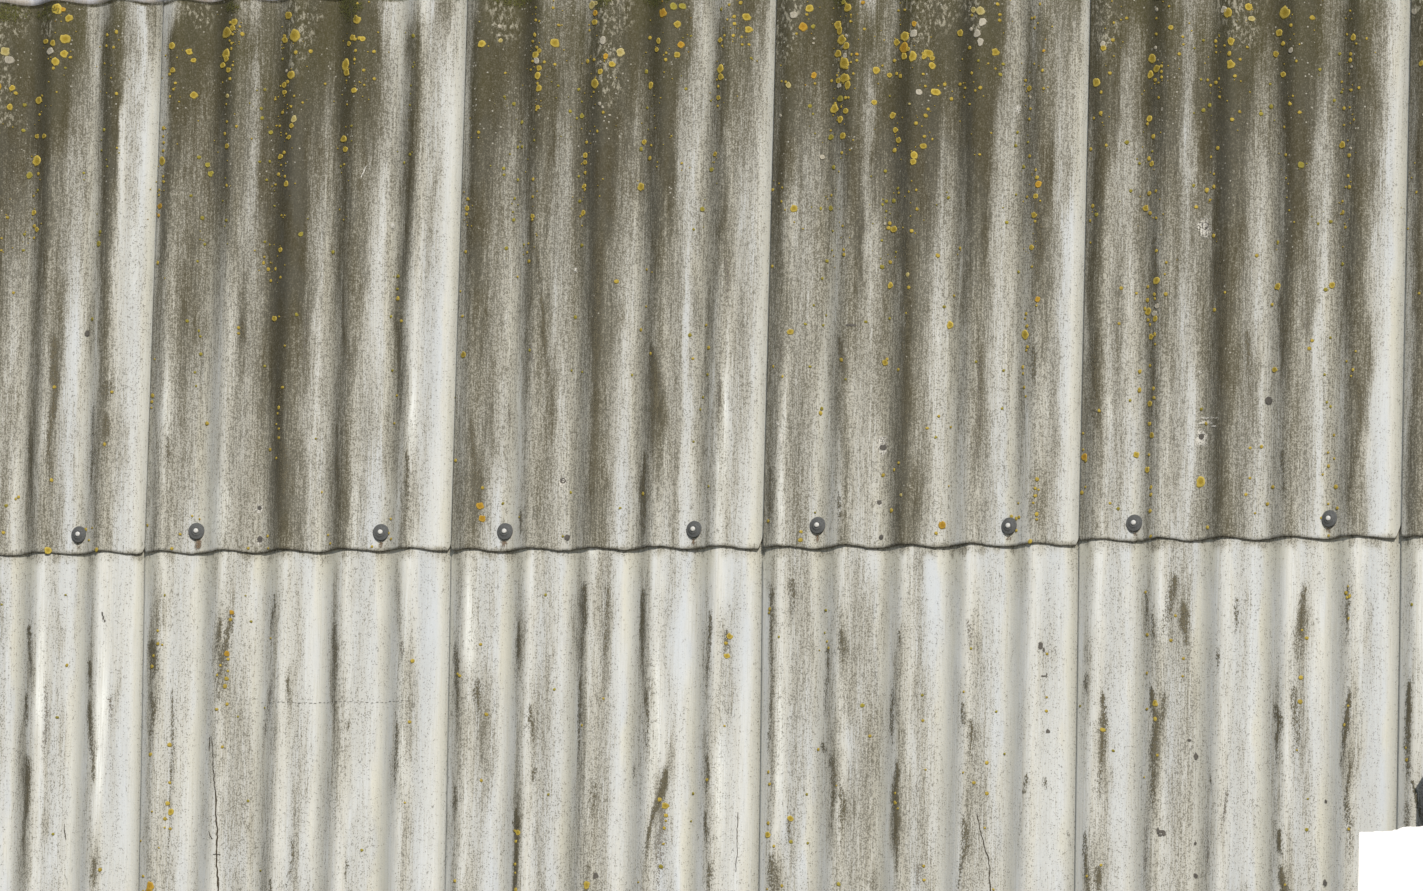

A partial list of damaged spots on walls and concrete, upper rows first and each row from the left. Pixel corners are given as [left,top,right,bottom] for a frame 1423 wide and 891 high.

leakage [27,335,60,536]
leakage [1145,575,1190,647]
leakage [22,686,51,850]
leakage [147,639,175,869]
crack [209,737,220,891]
leakage [512,808,521,891]
leakage [644,765,669,891]
leakage [890,763,921,891]
leakage [1083,673,1110,800]
leakage [1149,686,1166,808]
leakage [1340,687,1353,859]
leakage [1403,679,1423,827]